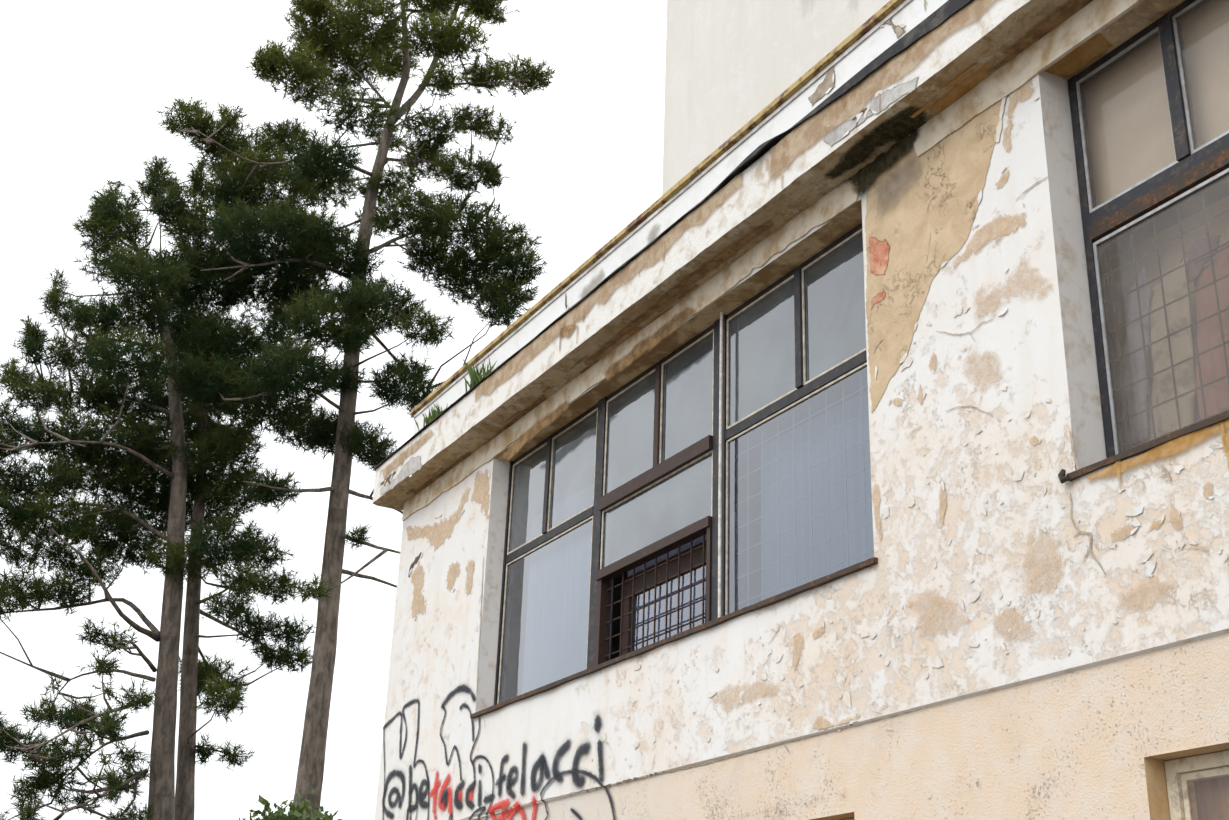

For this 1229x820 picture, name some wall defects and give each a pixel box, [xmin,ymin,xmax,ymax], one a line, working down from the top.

spalling [880,18,906,38]
peeling [1045,0,1179,76]
spalling [823,76,918,146]
water stain [825,0,1093,195]
flaking render [865,79,1051,413]
spalling [380,456,421,495]
peeling [406,470,490,551]
peeling [927,481,947,524]
crack [1069,431,1105,574]
corrosion [1088,419,1229,488]
peeling [411,561,426,620]
peeling [446,559,475,595]